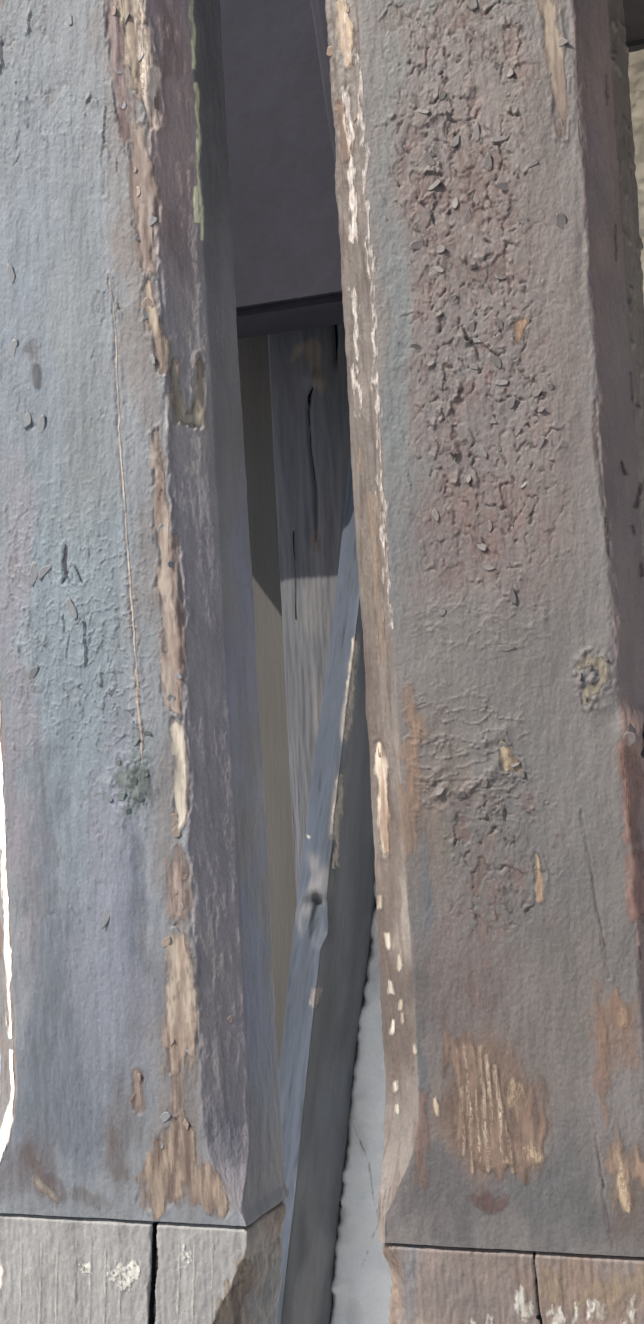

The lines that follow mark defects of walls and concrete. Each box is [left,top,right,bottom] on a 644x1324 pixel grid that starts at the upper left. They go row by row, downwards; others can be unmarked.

peeling [538,0,569,137]
peeling [105,0,205,425]
peeling [452,194,479,223]
peeling [135,433,228,1220]
peeling [0,743,14,1161]
peeling [433,1026,546,1183]
peeling [606,1125,644,1213]
peeling [73,1251,140,1324]
crack [148,1223,157,1324]
peeling [176,1245,194,1324]
crack [533,1252,542,1324]
peeling [514,1284,604,1324]